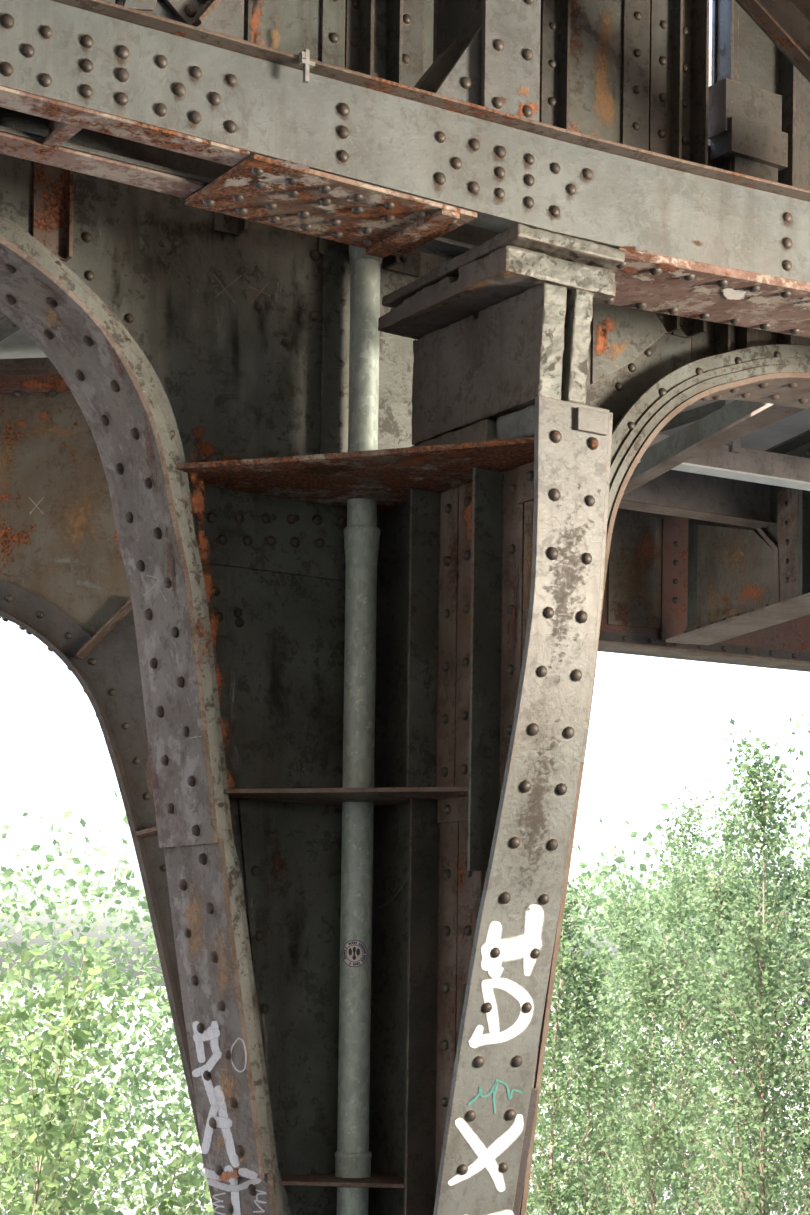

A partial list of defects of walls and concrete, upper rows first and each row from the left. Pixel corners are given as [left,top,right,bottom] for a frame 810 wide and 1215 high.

peeling [224,159,394,215]
rust [335,197,426,221]
rust [621,246,679,274]
peeling [668,269,772,307]
peeling [787,296,810,310]
rust [189,426,238,649]